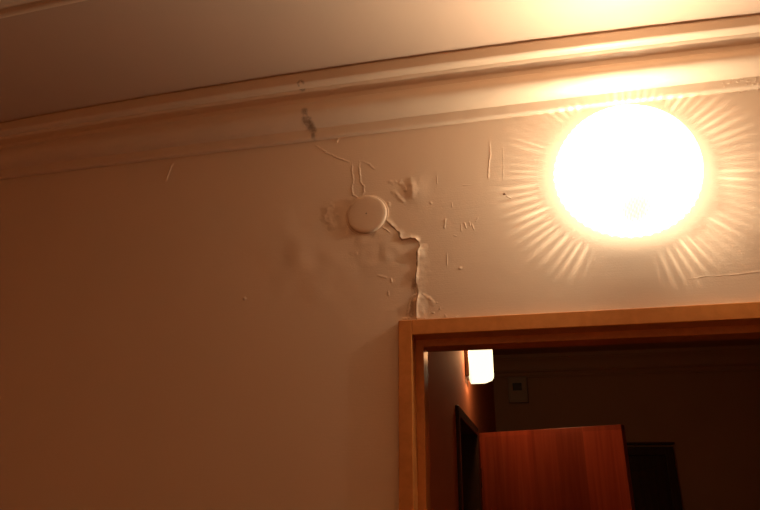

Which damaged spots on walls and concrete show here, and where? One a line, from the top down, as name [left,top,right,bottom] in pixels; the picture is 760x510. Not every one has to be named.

crack [311,139,378,198]
peeling [382,217,459,320]